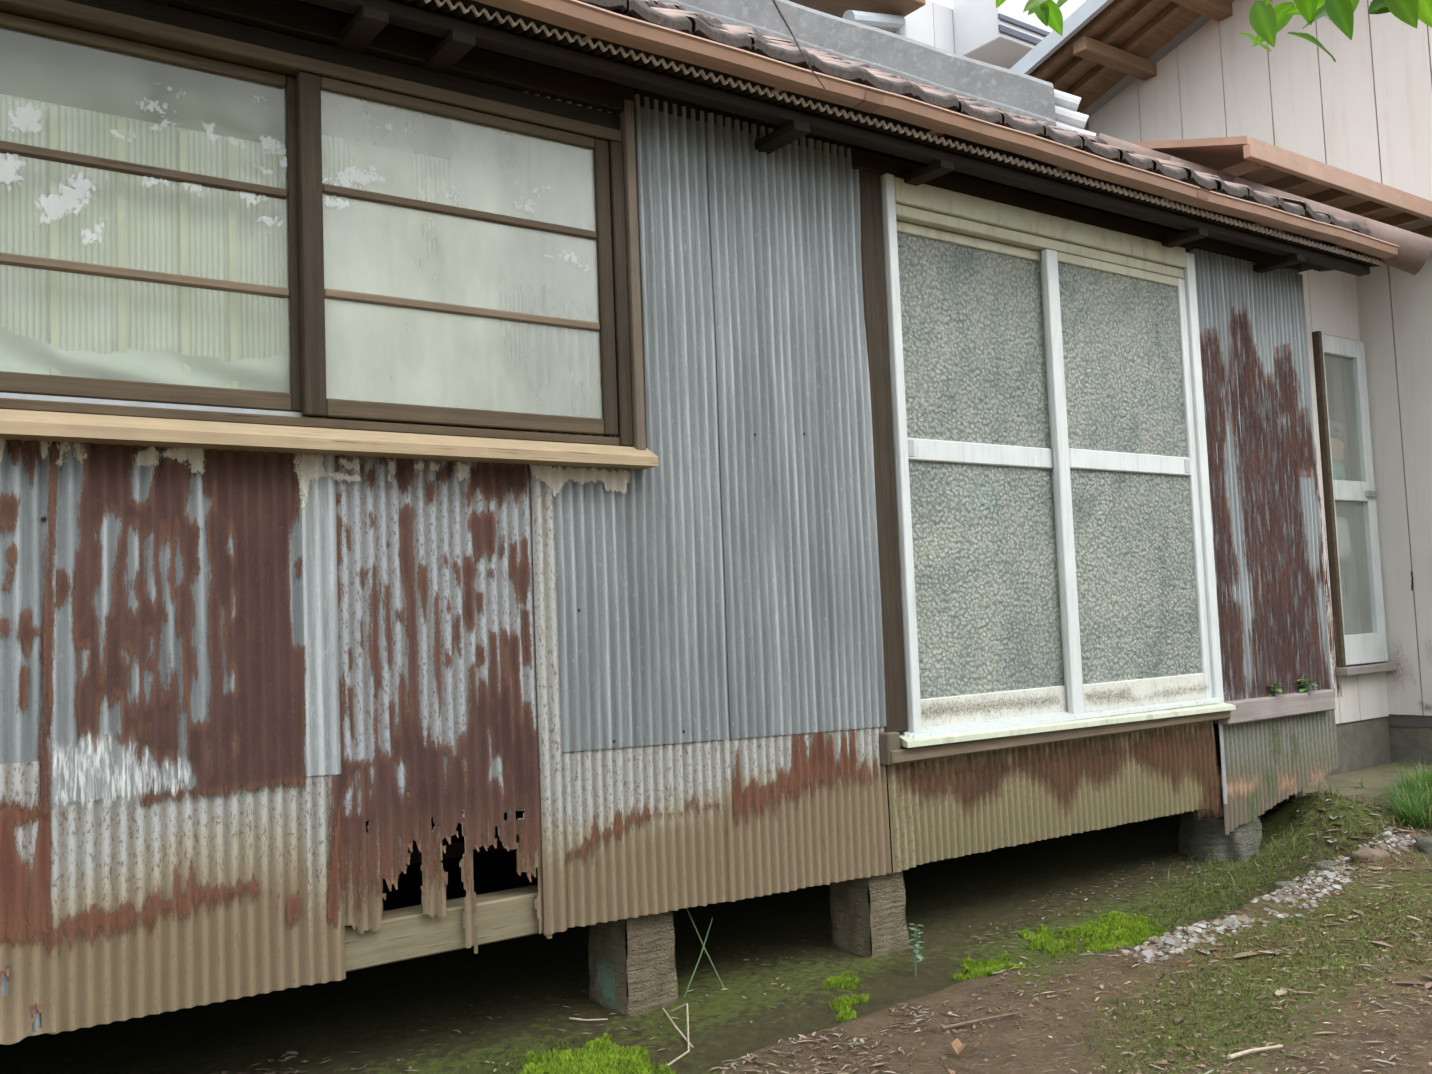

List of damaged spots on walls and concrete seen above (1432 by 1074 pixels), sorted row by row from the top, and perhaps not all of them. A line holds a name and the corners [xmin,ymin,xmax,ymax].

corrosion [1200,306,1342,701]
corrosion [0,440,306,954]
corrosion [327,455,543,927]
corrosion [679,729,878,825]
corrosion [898,729,1218,810]
peeling [382,840,421,900]
corrosion [566,805,662,866]